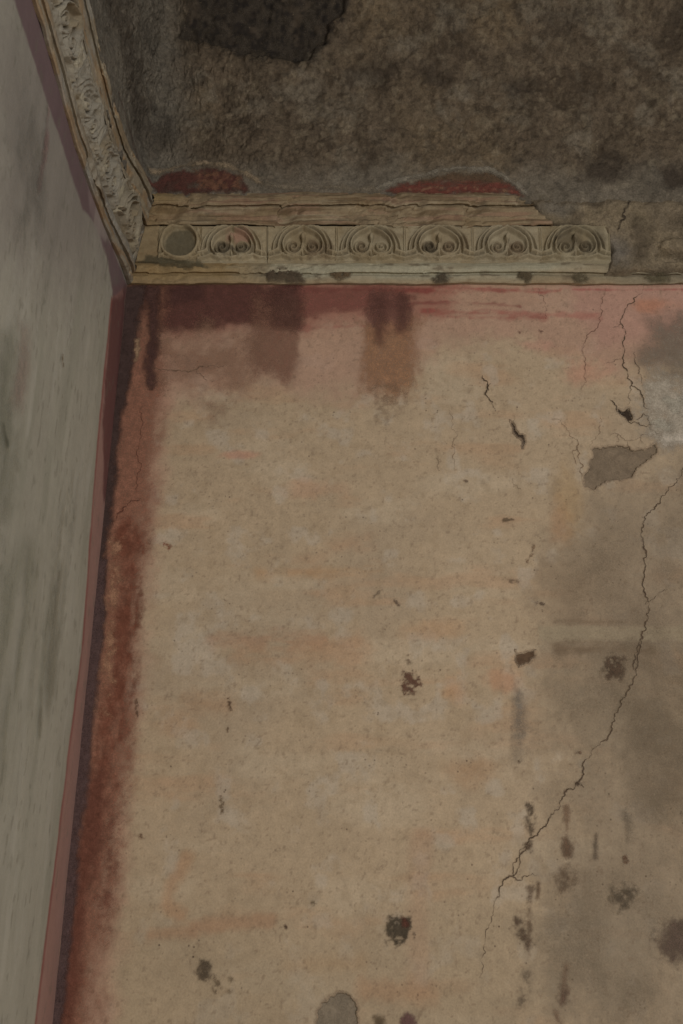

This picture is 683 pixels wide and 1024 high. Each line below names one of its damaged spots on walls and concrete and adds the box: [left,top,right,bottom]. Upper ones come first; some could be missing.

spalling [179,0,349,63]
damp [132,284,405,385]
crack [560,285,662,474]
peeling [583,375,683,491]
spalling [402,659,422,695]
spalling [605,656,625,680]
crack [480,468,683,976]
spalling [387,916,412,945]
spalling [315,992,359,1024]